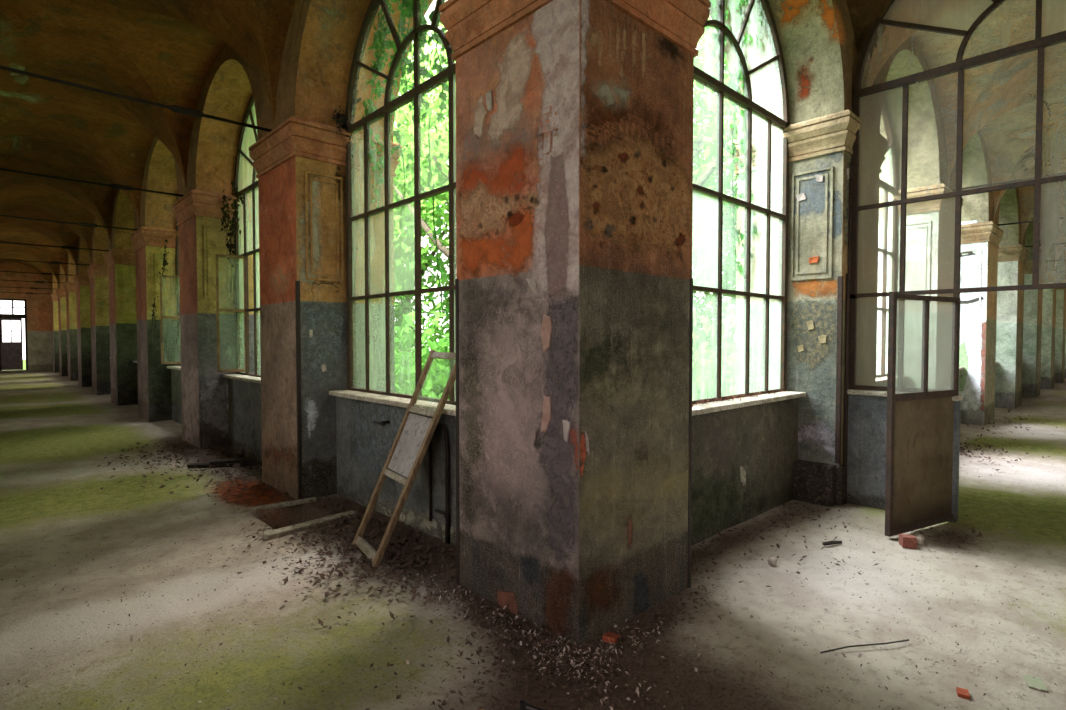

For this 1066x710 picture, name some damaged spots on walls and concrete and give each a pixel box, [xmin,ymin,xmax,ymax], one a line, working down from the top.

peeling [794,146,852,245]
flaking render [459,0,693,561]
peeling [791,299,837,370]